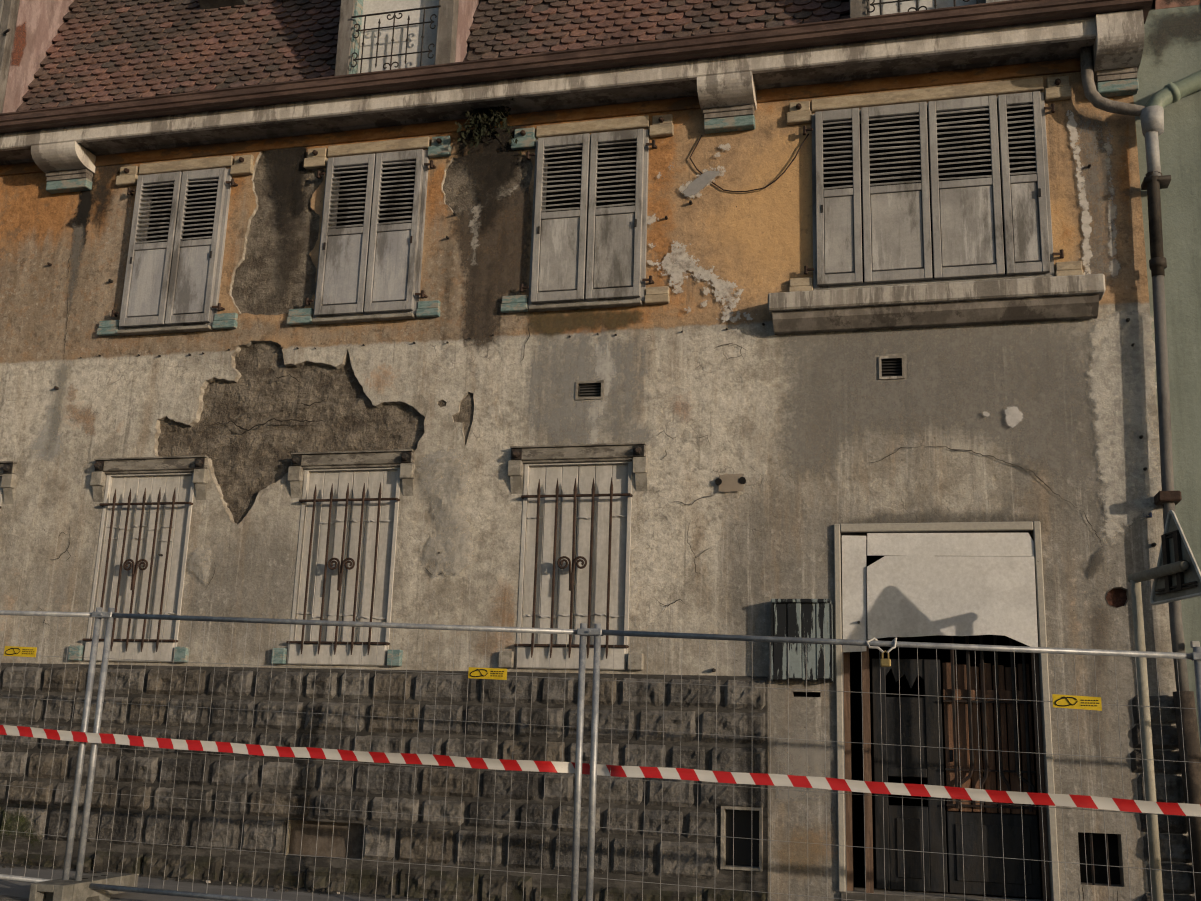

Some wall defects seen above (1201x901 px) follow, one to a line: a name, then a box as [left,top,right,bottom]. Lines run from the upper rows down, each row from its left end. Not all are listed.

damp [66,164,124,306]
spalling [229,147,325,316]
damp [454,125,532,349]
peeling [647,240,757,324]
peeling [679,143,731,199]
damp [1066,110,1121,277]
spalling [154,340,425,525]
spalling [437,392,474,445]
peeling [1005,406,1023,428]
crack [871,445,1102,545]
spalling [1106,587,1129,608]